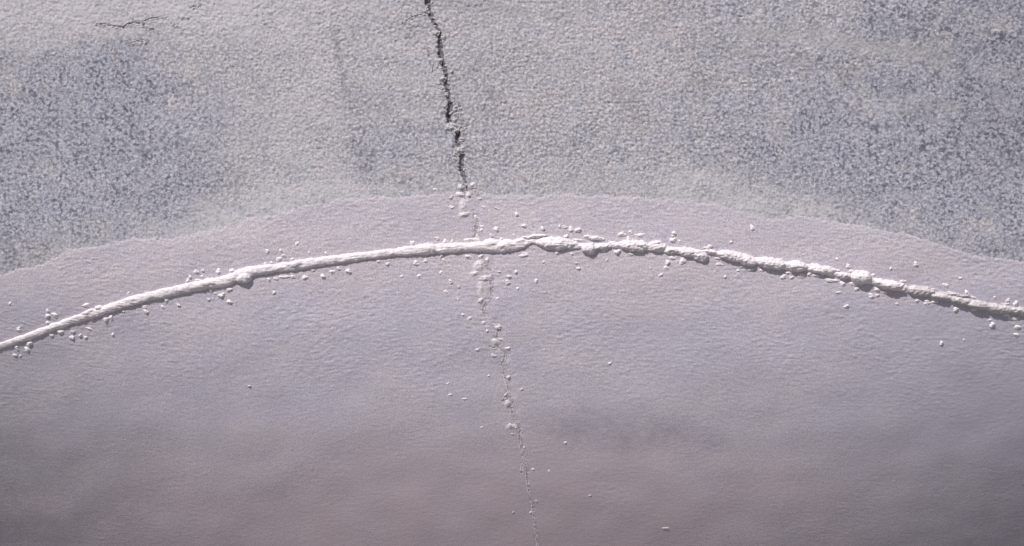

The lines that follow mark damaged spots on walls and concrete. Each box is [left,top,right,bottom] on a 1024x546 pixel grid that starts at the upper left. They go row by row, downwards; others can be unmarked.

crack [94,4,202,74]
crack [402,0,550,546]